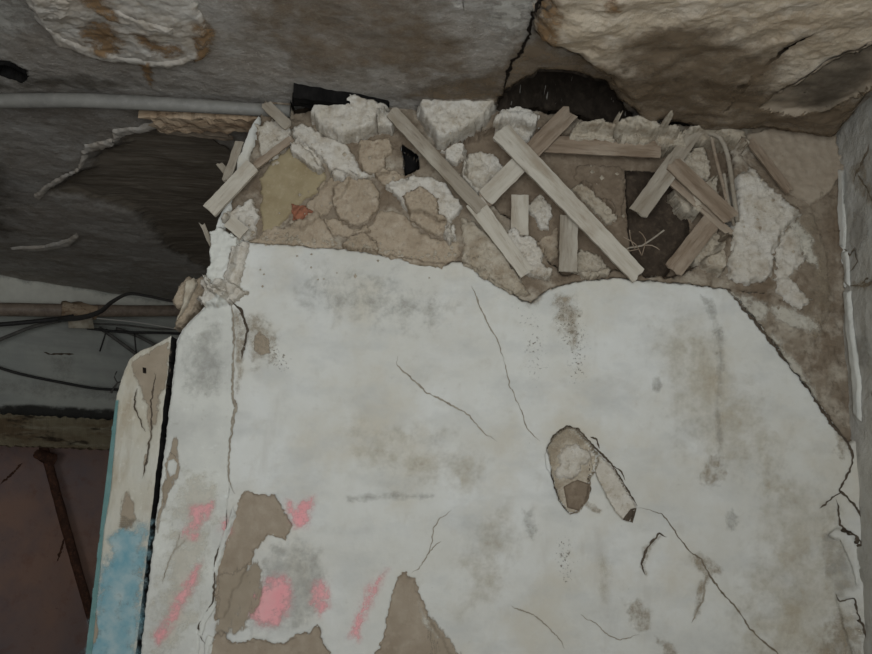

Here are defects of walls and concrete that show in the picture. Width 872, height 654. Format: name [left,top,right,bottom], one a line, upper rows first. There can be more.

peeling [0,0,210,69]
crack [504,0,553,89]
leakage [408,29,872,137]
peeling [206,94,624,305]
peeling [416,69,844,335]
crack [227,303,249,490]
spalling [545,425,637,523]
crack [722,288,862,547]
crack [197,513,227,642]
peeling [198,490,331,654]
peeling [374,571,458,654]
crack [641,508,778,654]